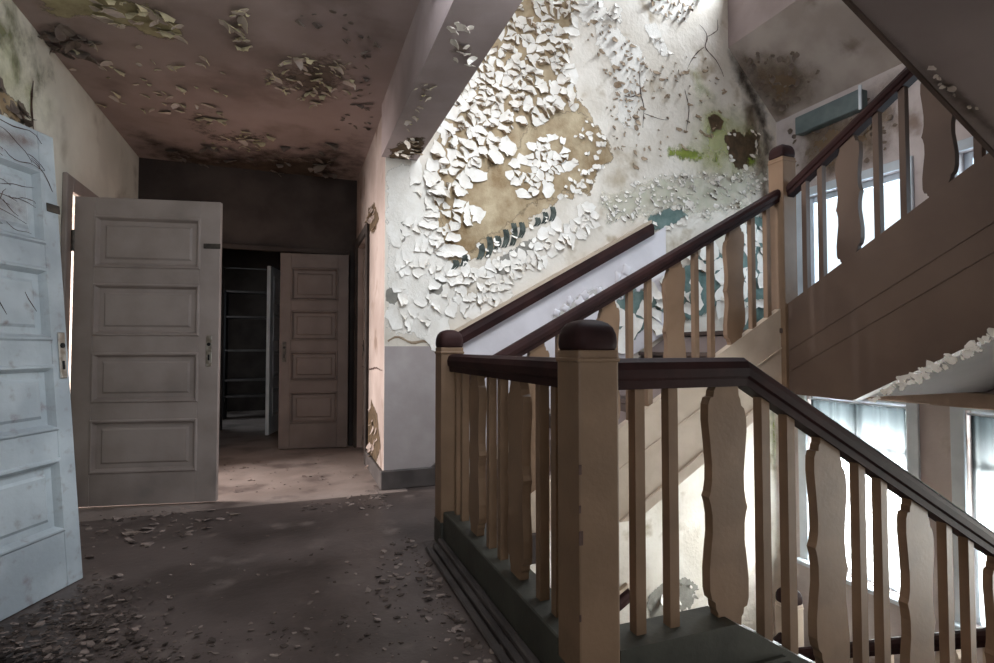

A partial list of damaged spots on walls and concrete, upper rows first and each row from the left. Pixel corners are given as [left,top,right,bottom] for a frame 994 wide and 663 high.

peeling [0,77,35,127]
peeling [37,0,188,79]
peeling [133,56,338,179]
peeling [219,8,253,52]
peeling [264,10,381,131]
peeling [365,0,769,354]
water stain [736,51,820,196]
flaking render [868,328,994,402]